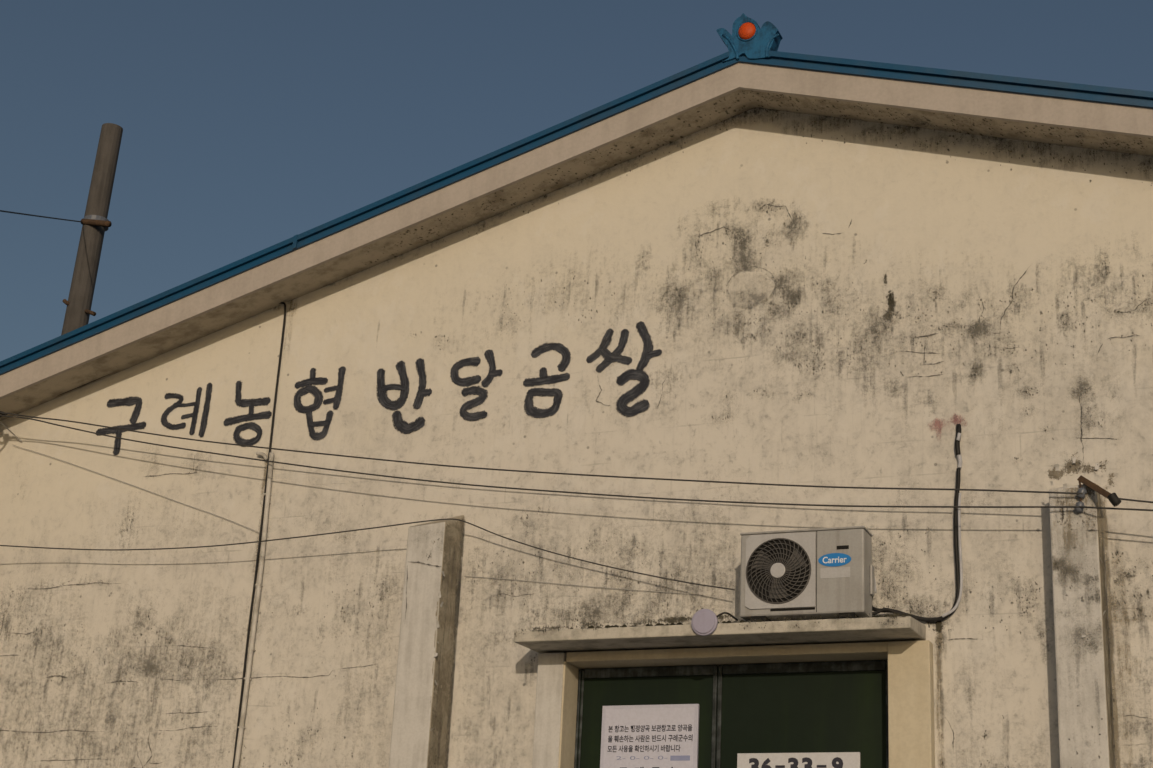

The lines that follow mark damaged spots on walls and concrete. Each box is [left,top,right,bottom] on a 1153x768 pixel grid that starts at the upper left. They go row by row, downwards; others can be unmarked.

water stain [392,90,799,257]
water stain [786,100,1153,186]
water stain [726,203,805,272]
water stain [660,286,690,319]
water stain [768,270,802,318]